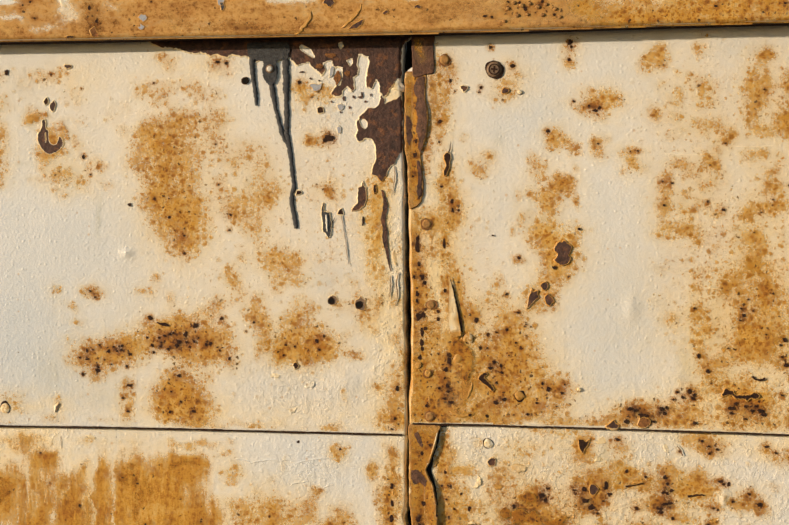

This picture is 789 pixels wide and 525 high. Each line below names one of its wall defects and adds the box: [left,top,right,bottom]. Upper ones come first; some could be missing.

rust [0,0,789,69]
peeling [37,97,65,154]
peeling [148,3,427,226]
rust [290,79,333,111]
rust [303,131,337,162]
rust [124,79,306,293]
rust [312,181,344,200]
rust [366,44,789,525]
rust [67,263,362,428]
rust [0,434,223,525]
rust [229,486,354,525]
peeling [411,469,427,487]